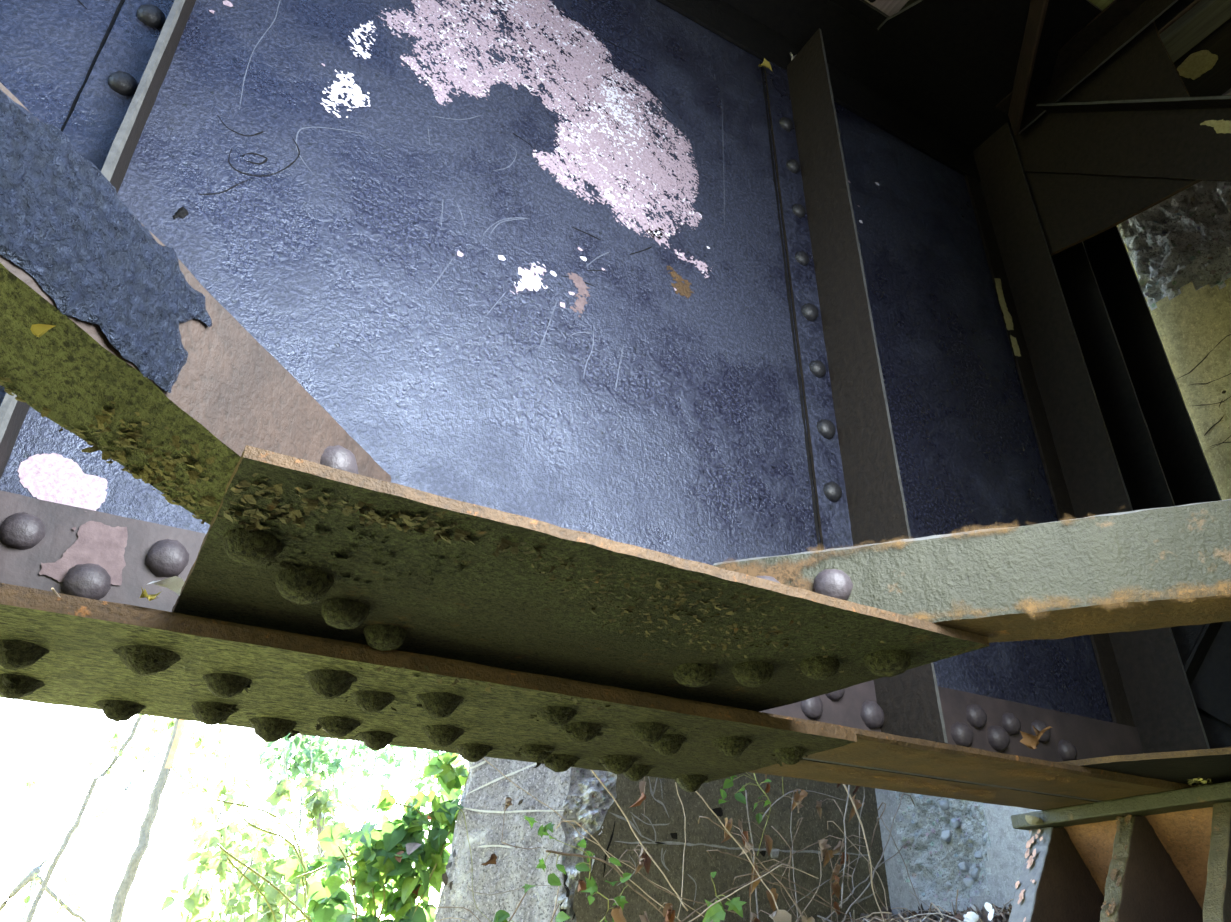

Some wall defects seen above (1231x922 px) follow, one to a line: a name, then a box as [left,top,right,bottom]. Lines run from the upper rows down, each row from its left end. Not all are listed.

peeling [320,64,370,118]
peeling [348,0,712,298]
peeling [510,247,590,317]
spalling [1118,180,1231,311]
crack [1176,334,1231,450]
peeling [18,453,128,585]